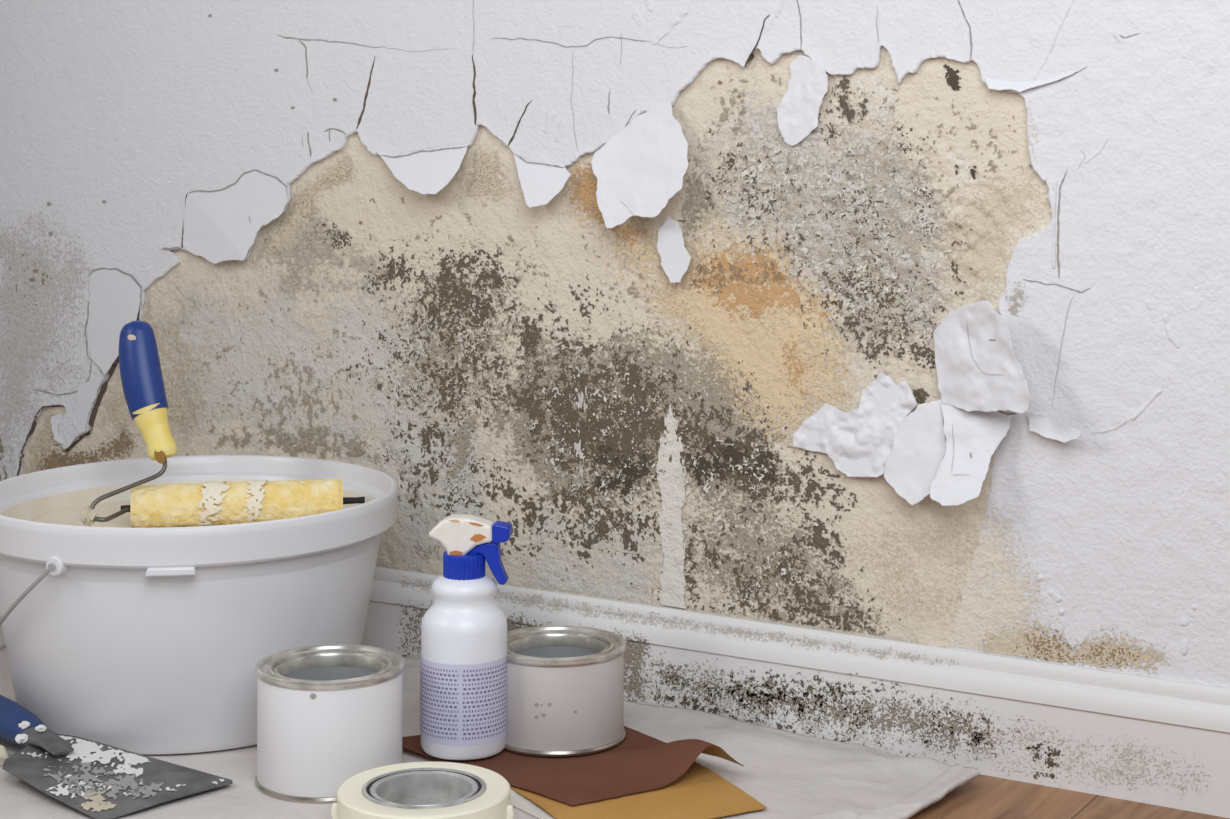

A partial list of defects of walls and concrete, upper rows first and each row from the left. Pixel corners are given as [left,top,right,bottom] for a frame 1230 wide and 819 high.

crack [278,35,441,157]
crack [379,0,687,168]
crack [744,0,802,67]
crack [957,0,972,59]
crack [162,169,288,250]
crack [1023,149,1090,404]
damp [143,293,214,453]
flaking render [21,46,1081,648]
damp [214,73,1174,676]
crack [967,324,1002,376]
mould [640,651,1063,779]